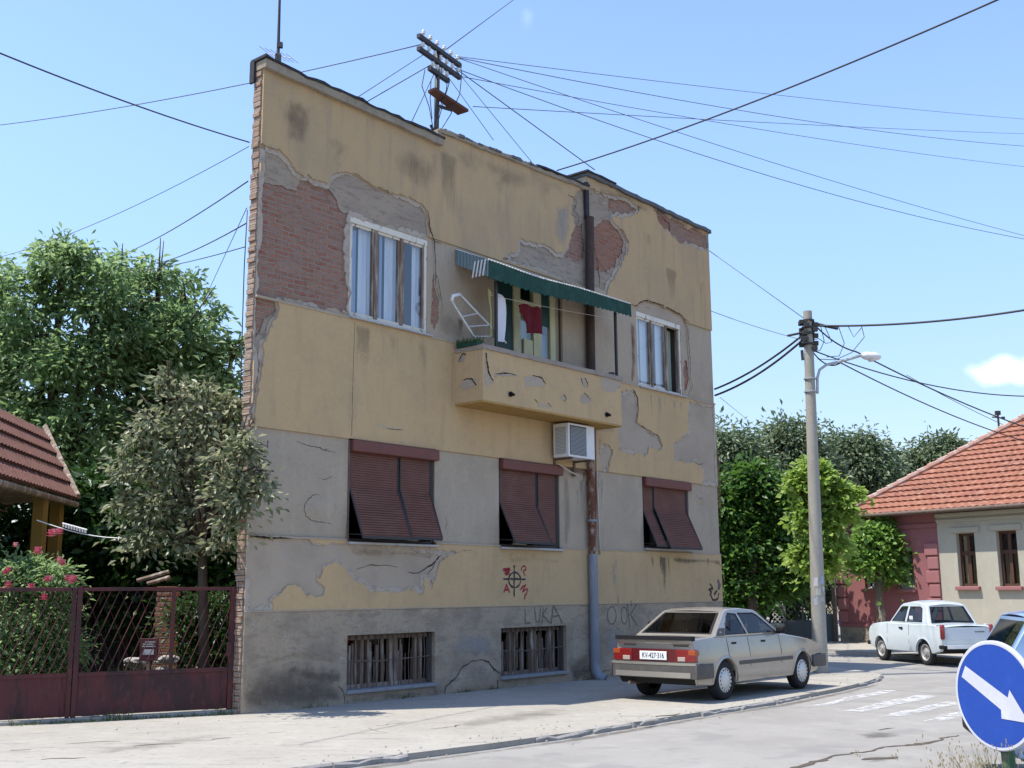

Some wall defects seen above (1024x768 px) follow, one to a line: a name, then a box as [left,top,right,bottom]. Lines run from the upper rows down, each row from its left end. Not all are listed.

flaking render [250,144,429,424]
flaking render [502,188,708,295]
flaking render [459,353,546,390]
flaking render [599,301,718,487]
crack [297,441,336,524]
rust [586,460,599,554]
peeling [244,535,471,614]
crack [445,659,502,690]